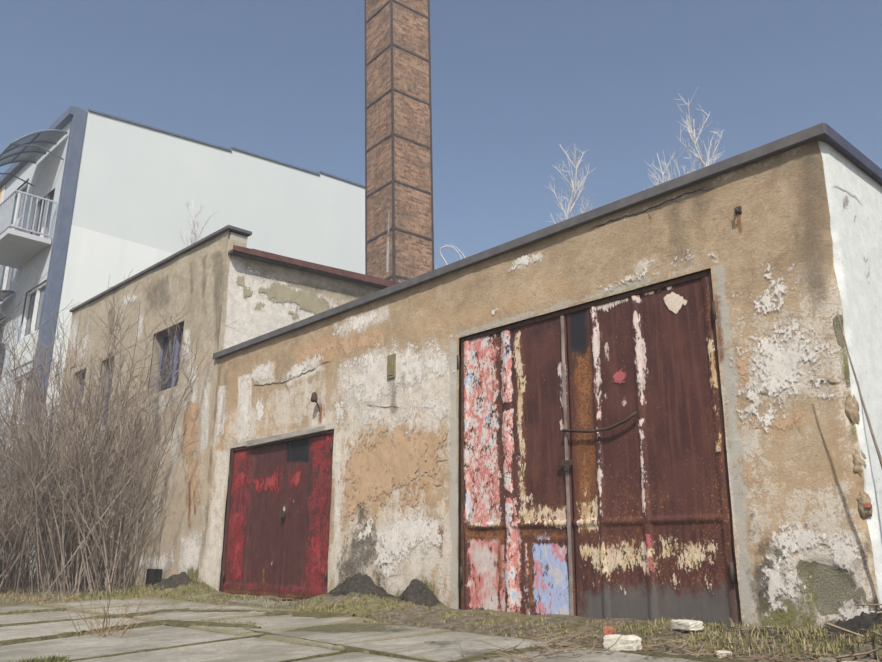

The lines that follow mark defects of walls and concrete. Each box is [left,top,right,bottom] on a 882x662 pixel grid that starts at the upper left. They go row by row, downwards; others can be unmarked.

crack [590,187,712,229]
flaking render [148,329,226,510]
crack [253,361,333,391]
flaking render [226,249,717,615]
rust [572,348,597,535]
peeling [706,260,844,444]
peeling [154,528,202,581]
rust [465,530,505,586]
damp [752,542,794,623]
flaking render [751,519,874,627]